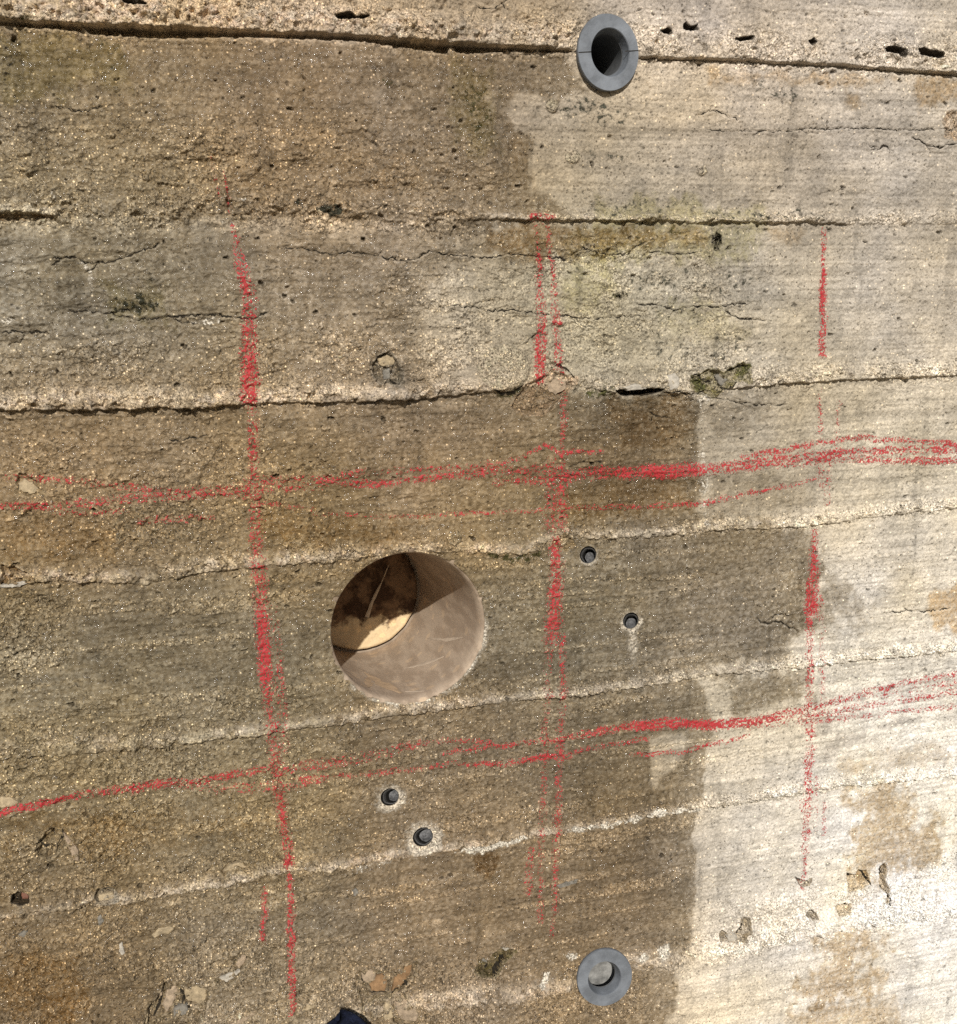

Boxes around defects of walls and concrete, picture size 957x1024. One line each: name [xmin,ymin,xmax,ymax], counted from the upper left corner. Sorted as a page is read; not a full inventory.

crack [51,243,159,273]
crack [286,241,696,261]
spalling [616,361,753,399]
crack [647,388,783,420]
leakage [567,772,874,833]
leakage [454,836,529,855]
spalling [835,863,891,916]
spalling [719,917,753,944]
leakage [639,943,670,963]